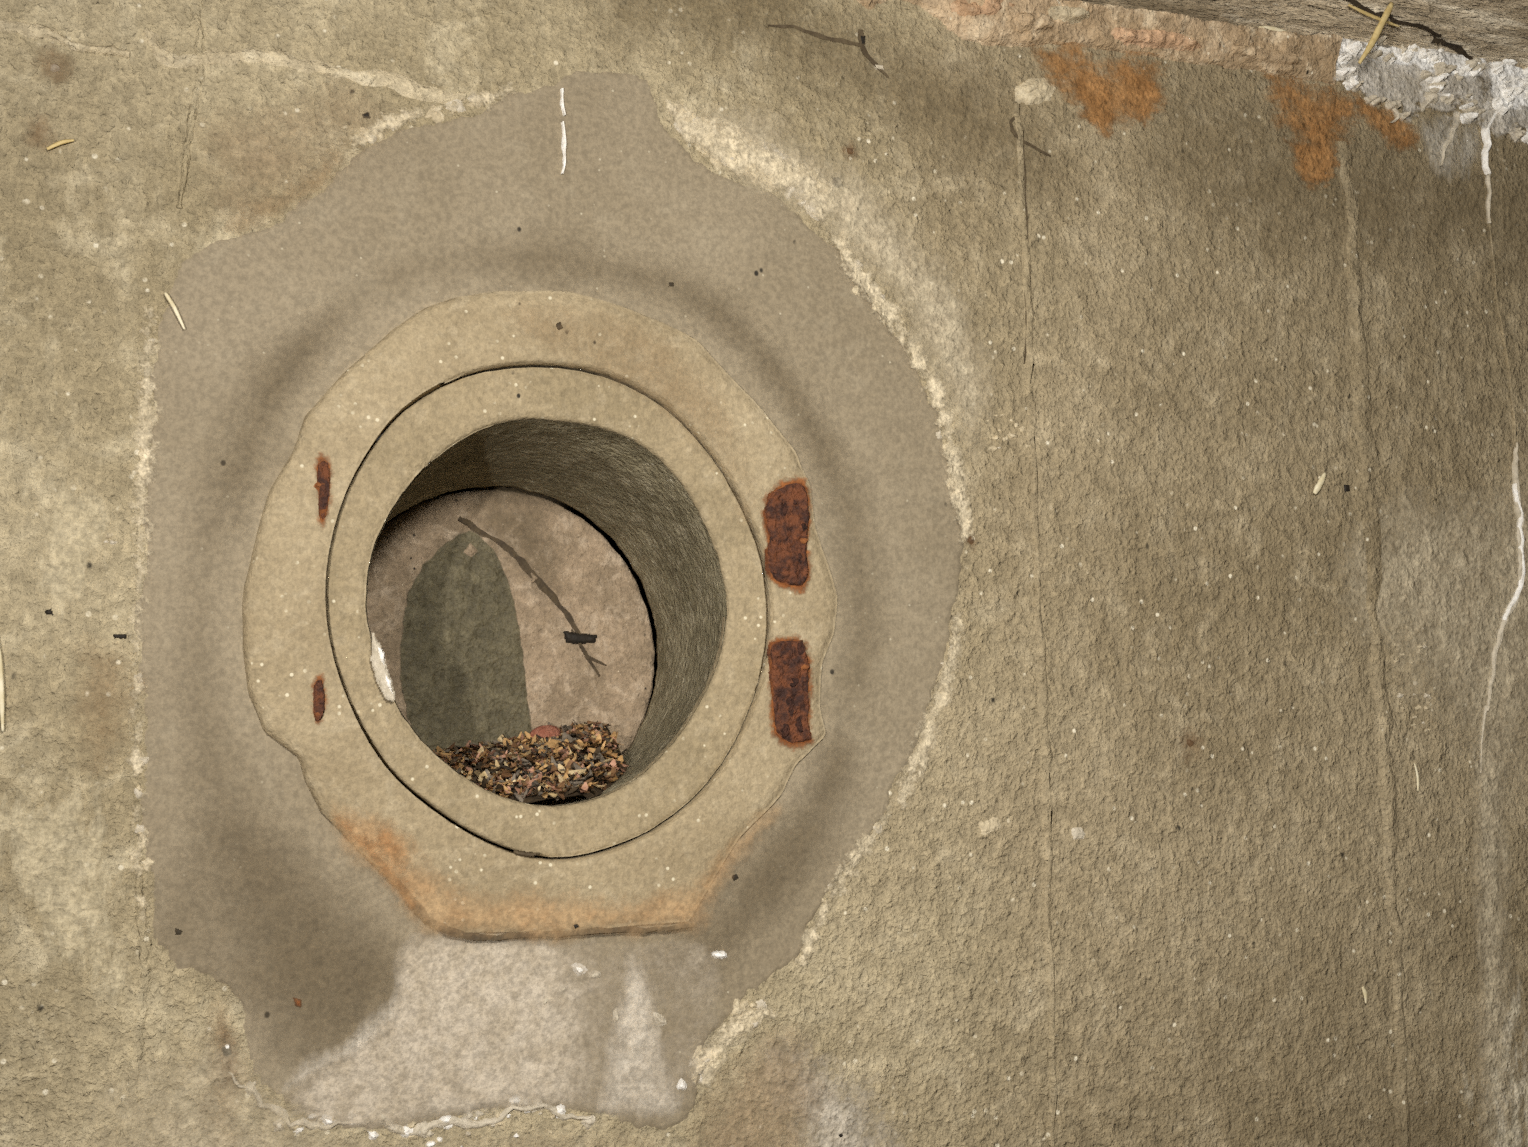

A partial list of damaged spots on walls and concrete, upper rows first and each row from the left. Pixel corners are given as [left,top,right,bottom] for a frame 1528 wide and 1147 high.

crack [1347,0,1473,60]
rust [1040,45,1159,134]
rust [1268,75,1418,181]
damp [1335,36,1528,224]
rust [313,453,331,524]
rust [763,478,811,594]
rust [312,676,326,723]
rust [767,637,813,748]
damp [711,950,728,959]
damp [298,940,601,1147]
damp [604,976,702,1110]